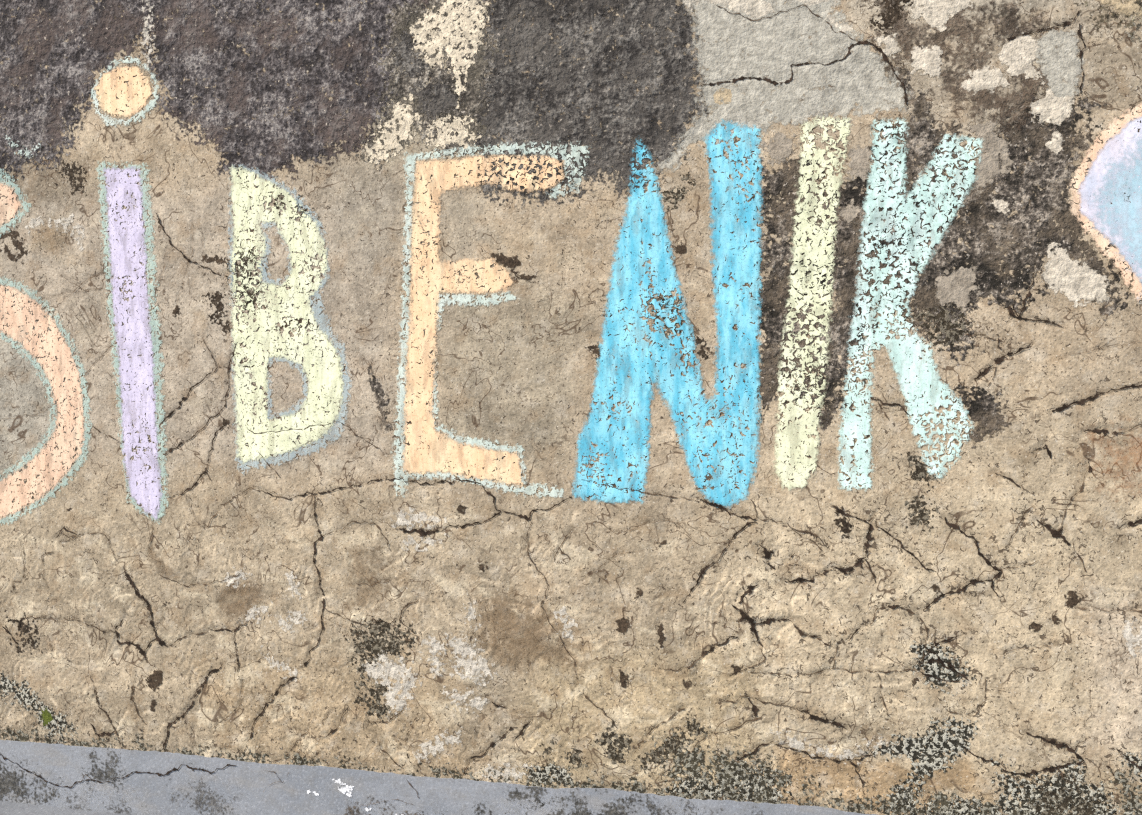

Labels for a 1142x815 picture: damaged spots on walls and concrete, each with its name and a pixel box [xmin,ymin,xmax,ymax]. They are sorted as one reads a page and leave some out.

crack [701,4,908,106]
water stain [0,0,430,227]
water stain [461,0,710,212]
crack [1052,384,1142,435]
crack [1119,517,1142,529]
crack [1,340,1092,806]
crack [1075,605,1142,613]
crack [964,732,1142,782]
water stain [508,787,669,815]